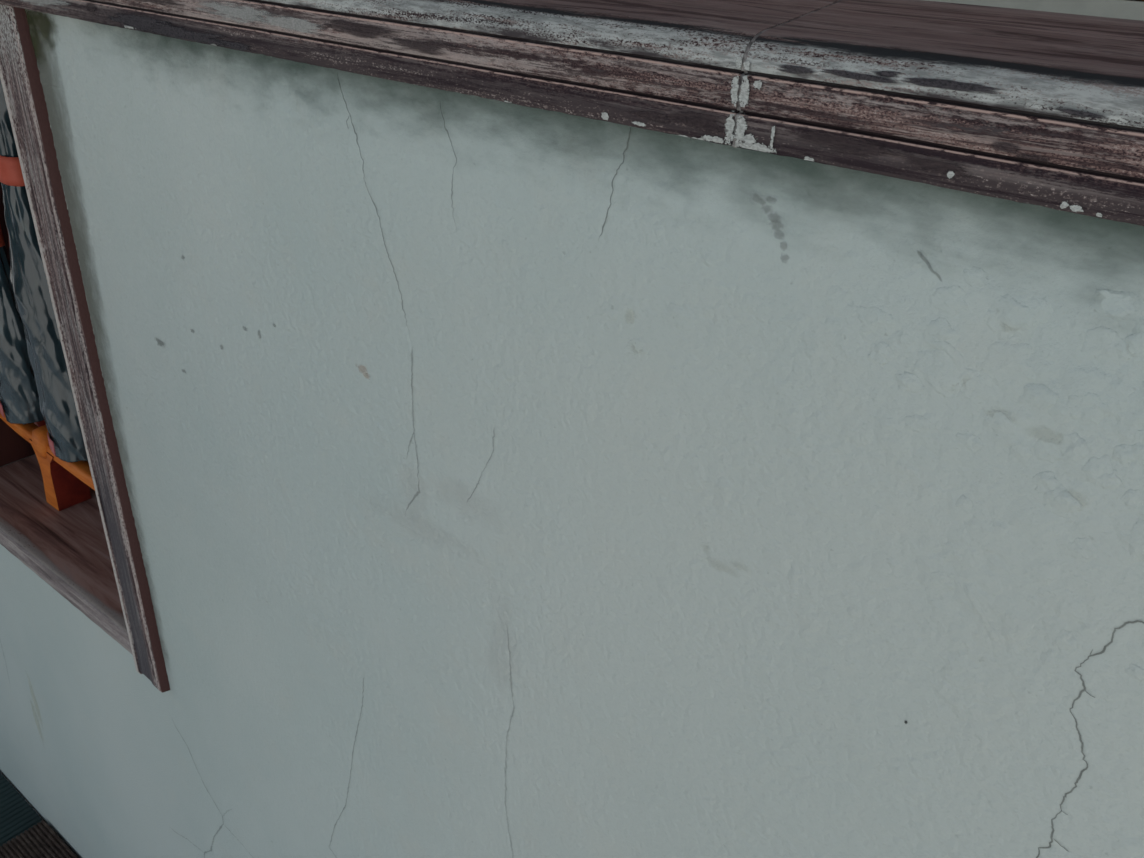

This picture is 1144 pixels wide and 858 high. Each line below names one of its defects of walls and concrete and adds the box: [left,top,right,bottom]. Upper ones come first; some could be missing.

peeling [631,56,777,153]
peeling [796,130,973,179]
peeling [1060,201,1102,217]
crack [1036,620,1144,858]